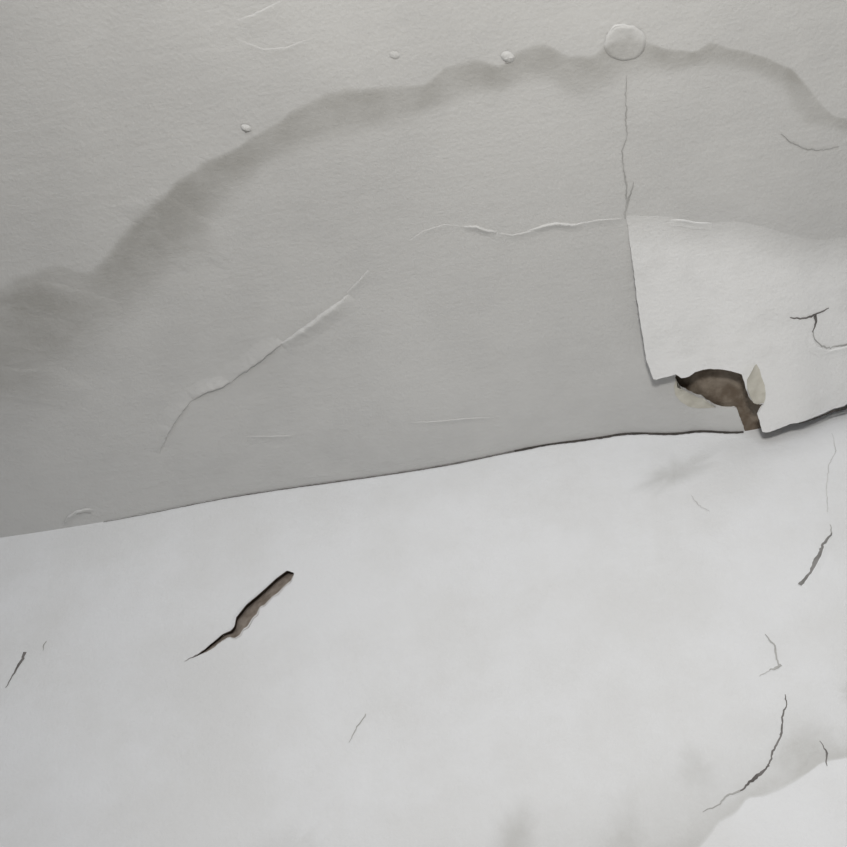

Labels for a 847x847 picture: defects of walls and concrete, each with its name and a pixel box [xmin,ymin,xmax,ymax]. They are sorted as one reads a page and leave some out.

damp [0,40,847,440]
crack [407,76,634,249]
peeling [626,216,847,432]
crack [790,308,847,359]
damp [618,444,730,505]
crack [798,434,838,590]
crack [703,694,793,812]